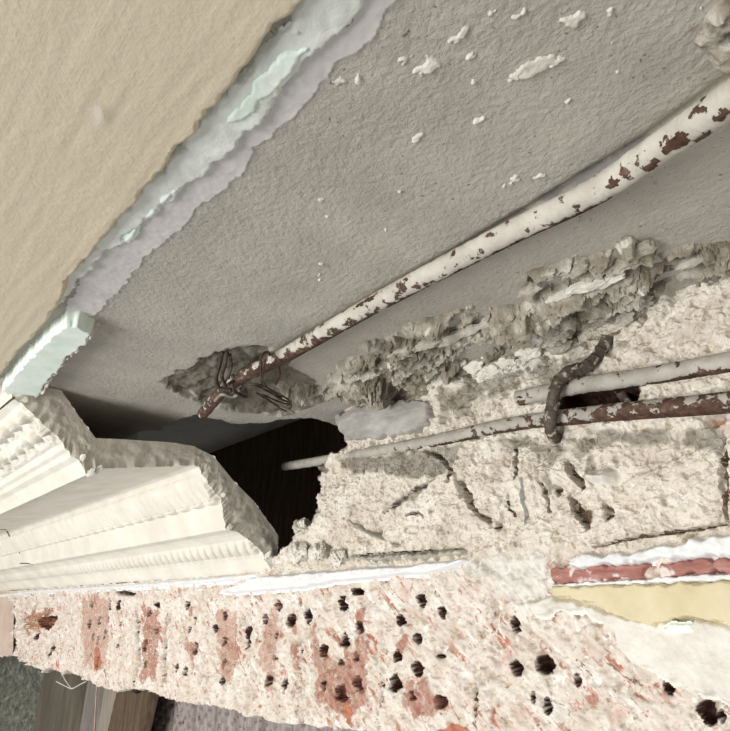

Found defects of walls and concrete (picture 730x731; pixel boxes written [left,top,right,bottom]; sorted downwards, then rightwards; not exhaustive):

peeling [558,10,586,29]
peeling [412,54,444,77]
peeling [507,54,565,82]
flaking render [52,0,396,340]
corrosion [640,108,730,172]
corrosion [251,175,620,377]
spalling [273,235,730,410]
corrosion [556,403,730,427]
corrosion [642,368,730,386]
peeling [550,535,730,634]
spalling [139,602,161,683]
spalling [310,623,369,724]